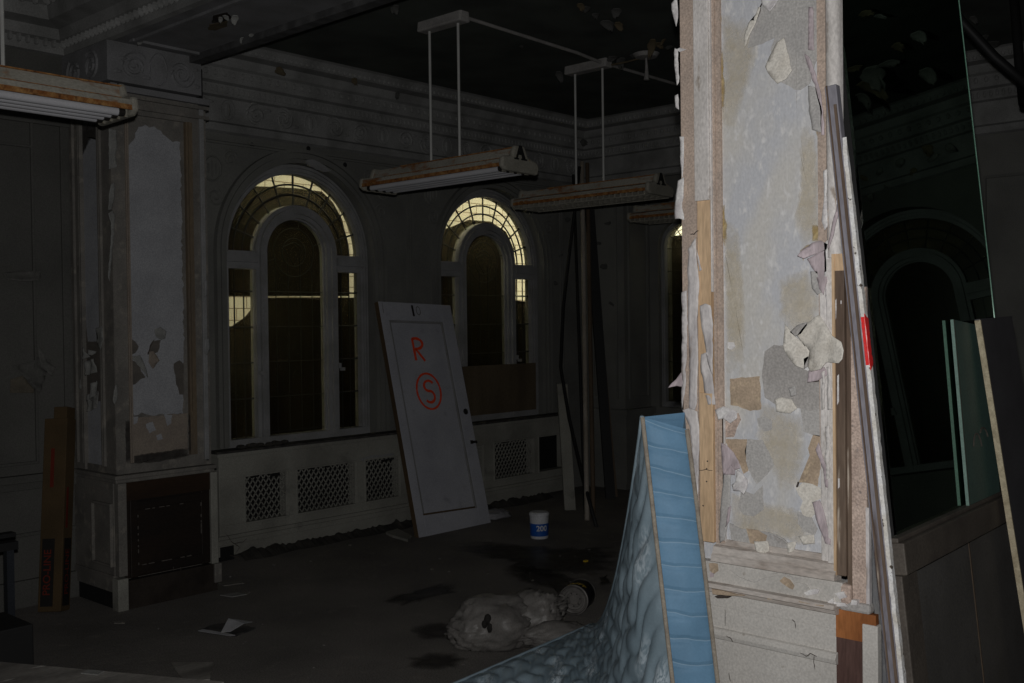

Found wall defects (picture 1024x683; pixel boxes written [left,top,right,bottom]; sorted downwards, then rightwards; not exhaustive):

peeling [744,0,824,135]
spalling [108,125,188,456]
peeling [668,169,844,553]
spalling [709,563,745,598]